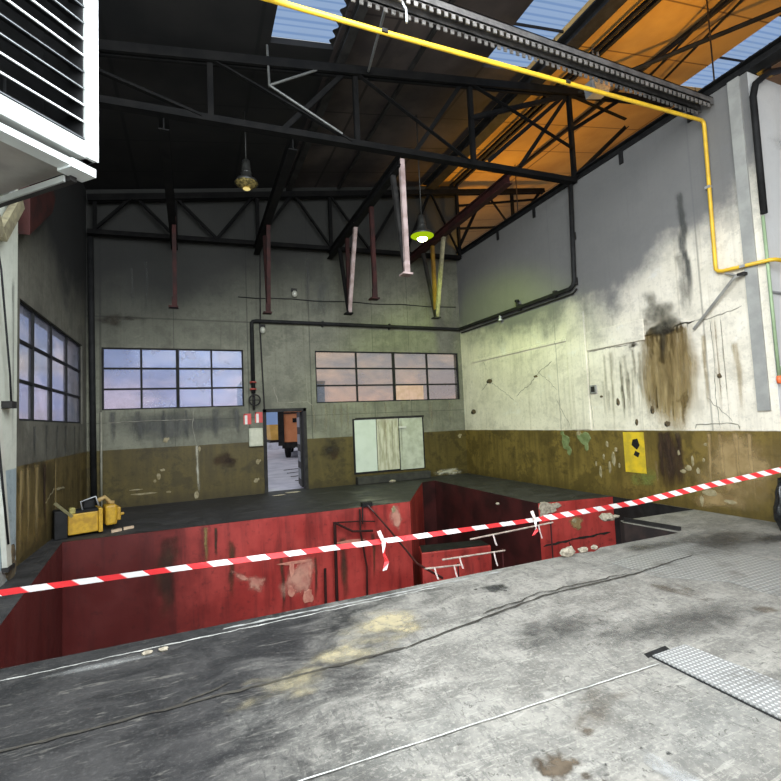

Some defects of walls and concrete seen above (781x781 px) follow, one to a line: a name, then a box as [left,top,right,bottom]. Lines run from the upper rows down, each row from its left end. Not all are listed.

damp [677,194,691,289]
crack [482,361,570,425]
peeling [560,431,591,455]
spalling [0,501,421,669]